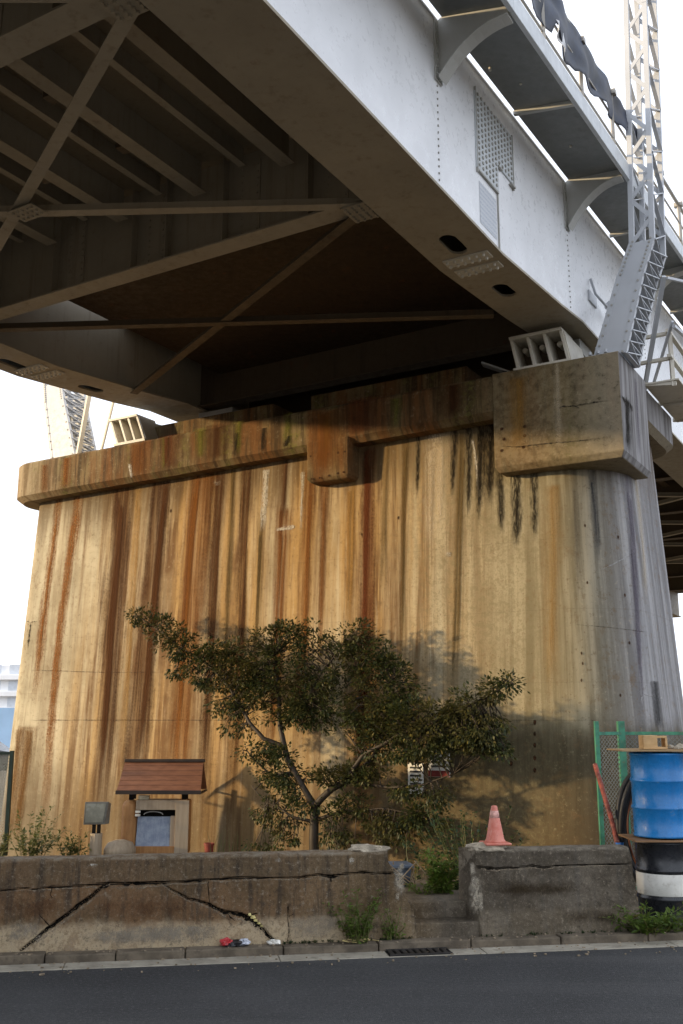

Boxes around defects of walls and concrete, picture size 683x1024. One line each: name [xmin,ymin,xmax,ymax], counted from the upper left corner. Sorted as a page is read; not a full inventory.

rust [35,497,82,771]
rust [96,481,172,774]
rust [173,469,264,760]
rust [275,460,288,622]
rust [299,471,345,694]
rust [347,448,375,759]
rust [454,438,465,631]
water stain [450,424,538,537]
rust [4,728,32,823]
crack [0,871,391,951]